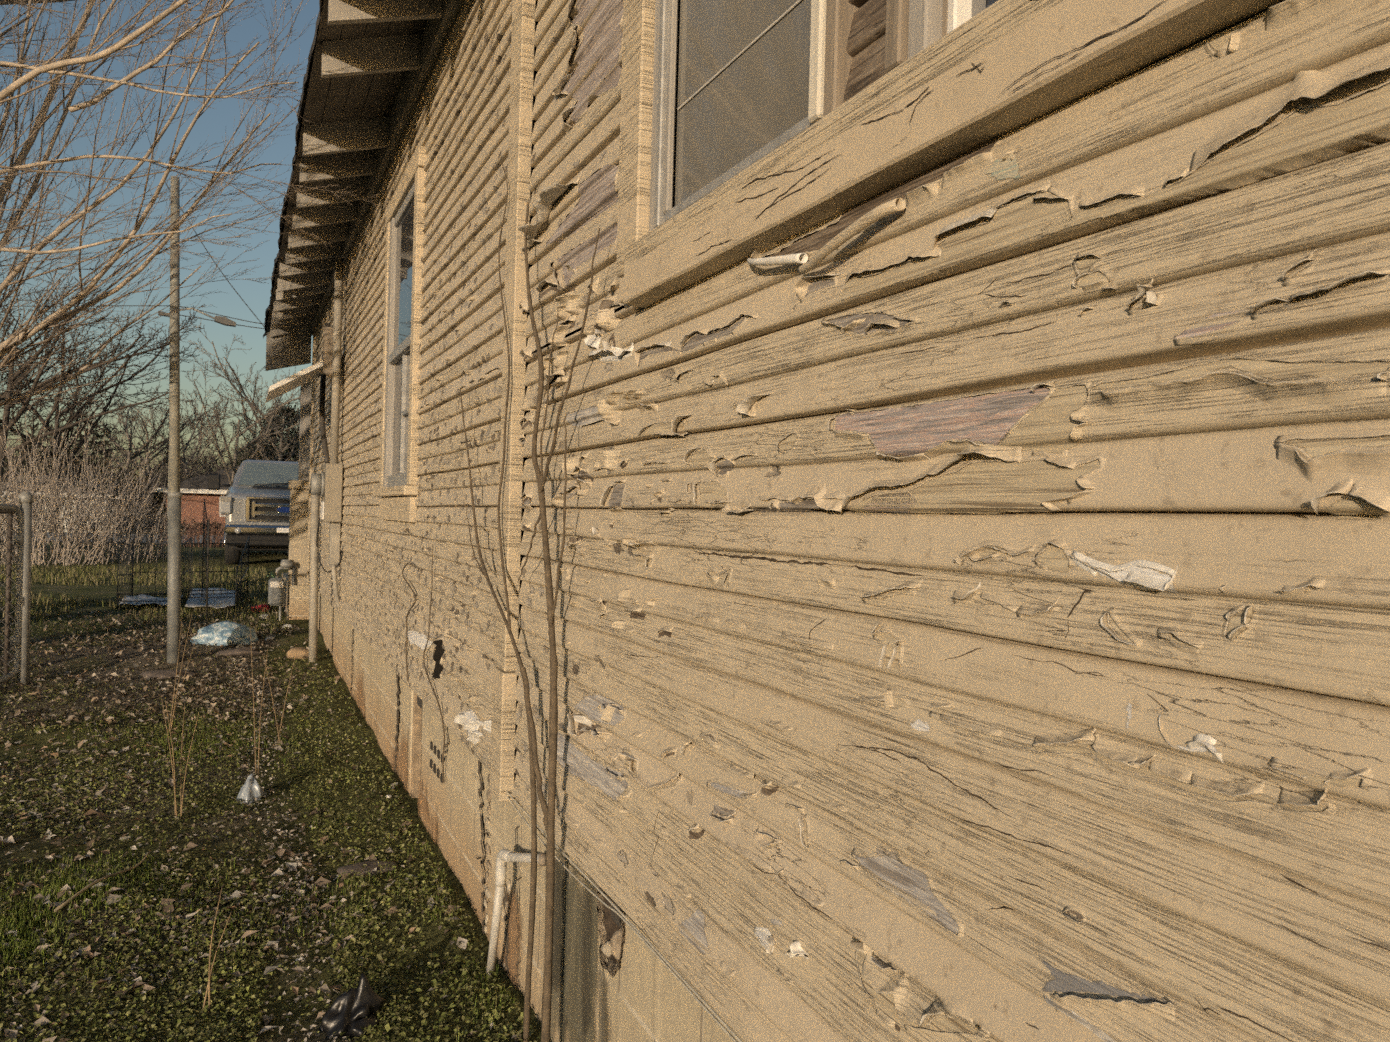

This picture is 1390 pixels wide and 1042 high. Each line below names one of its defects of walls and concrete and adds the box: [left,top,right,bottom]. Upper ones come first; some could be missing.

peeling [552,0,624,135]
crack [861,0,1165,125]
crack [694,150,840,254]
peeling [751,53,1390,339]
peeling [518,164,1390,520]
peeling [552,446,660,632]
crack [941,589,1110,679]
peeling [951,539,1179,619]
crack [838,744,1067,854]
peeling [859,689,1373,820]
crack [1280,924,1390,951]
crack [1193,996,1293,1042]